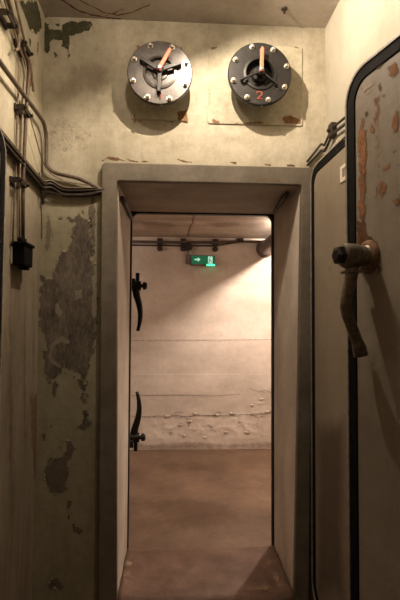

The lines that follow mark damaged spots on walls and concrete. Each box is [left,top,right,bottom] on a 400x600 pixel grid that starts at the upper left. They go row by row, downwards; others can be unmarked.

peeling [20,0,94,58]
rust [356,84,385,246]
peeling [38,198,99,430]
peeling [42,438,76,495]